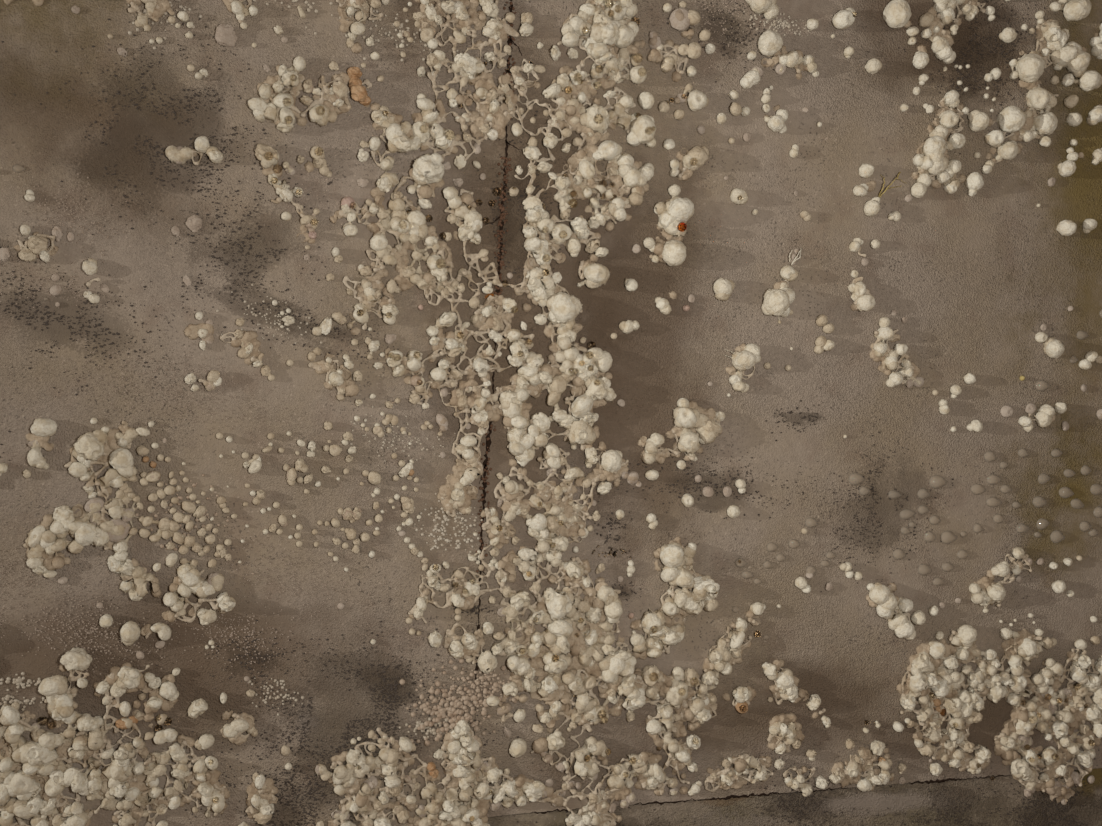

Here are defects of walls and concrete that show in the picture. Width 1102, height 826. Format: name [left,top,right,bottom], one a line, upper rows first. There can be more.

crack [503,0,522,92]
leakage [761,46,819,134]
leakage [898,0,1102,258]
leakage [0,0,807,826]
crack [475,118,520,630]
crack [535,807,579,815]
crack [634,788,844,805]
crack [909,775,1009,784]